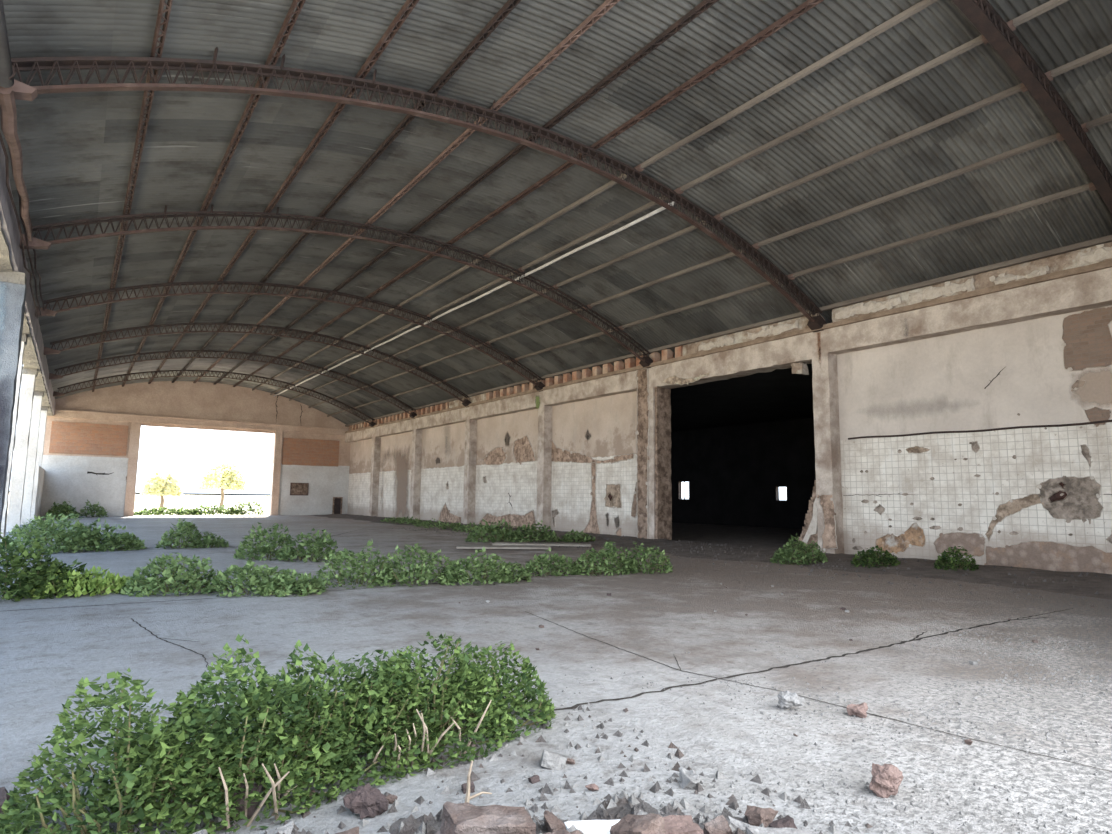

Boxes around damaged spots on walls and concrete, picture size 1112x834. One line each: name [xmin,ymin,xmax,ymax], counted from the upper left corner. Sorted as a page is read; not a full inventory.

flaking render [663,373,709,385]
flaking render [1061,306,1112,427]
flaking render [482,435,536,483]
flaking render [551,368,650,539]
peeling [438,481,462,523]
peeling [478,510,536,529]
flaking render [817,494,838,551]
peeling [852,444,1112,574]
crack [9,595,255,667]
crack [525,608,1112,772]